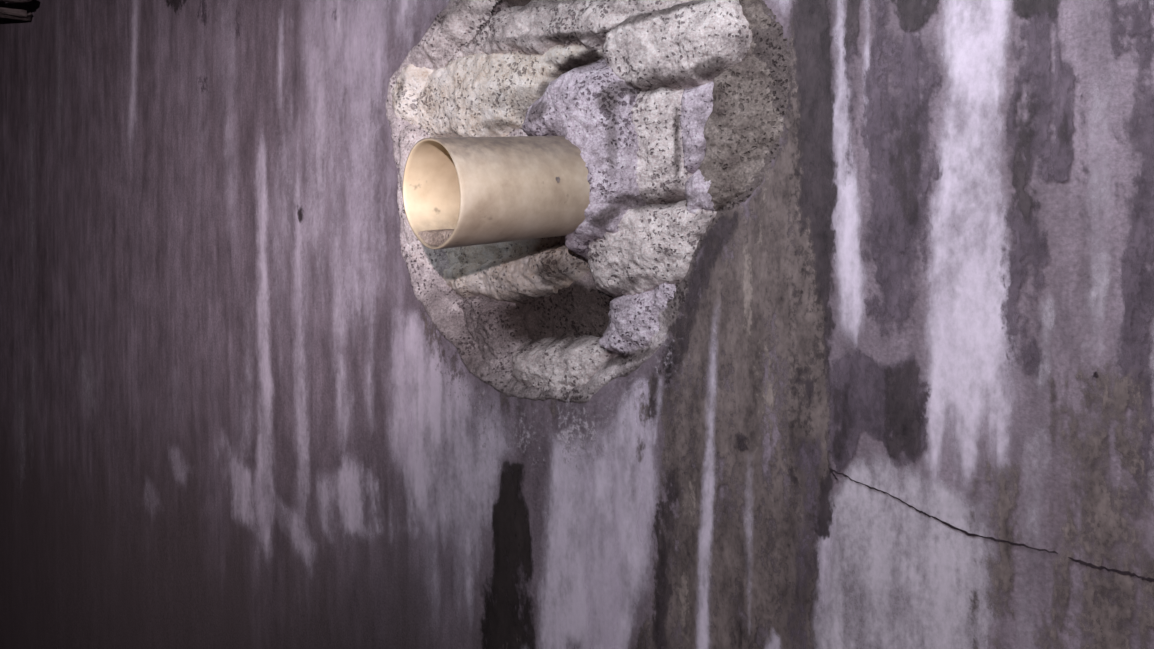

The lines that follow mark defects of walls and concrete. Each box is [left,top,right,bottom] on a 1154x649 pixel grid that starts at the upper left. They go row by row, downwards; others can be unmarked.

leakage [390,0,1154,649]
crack [829,468,1154,582]